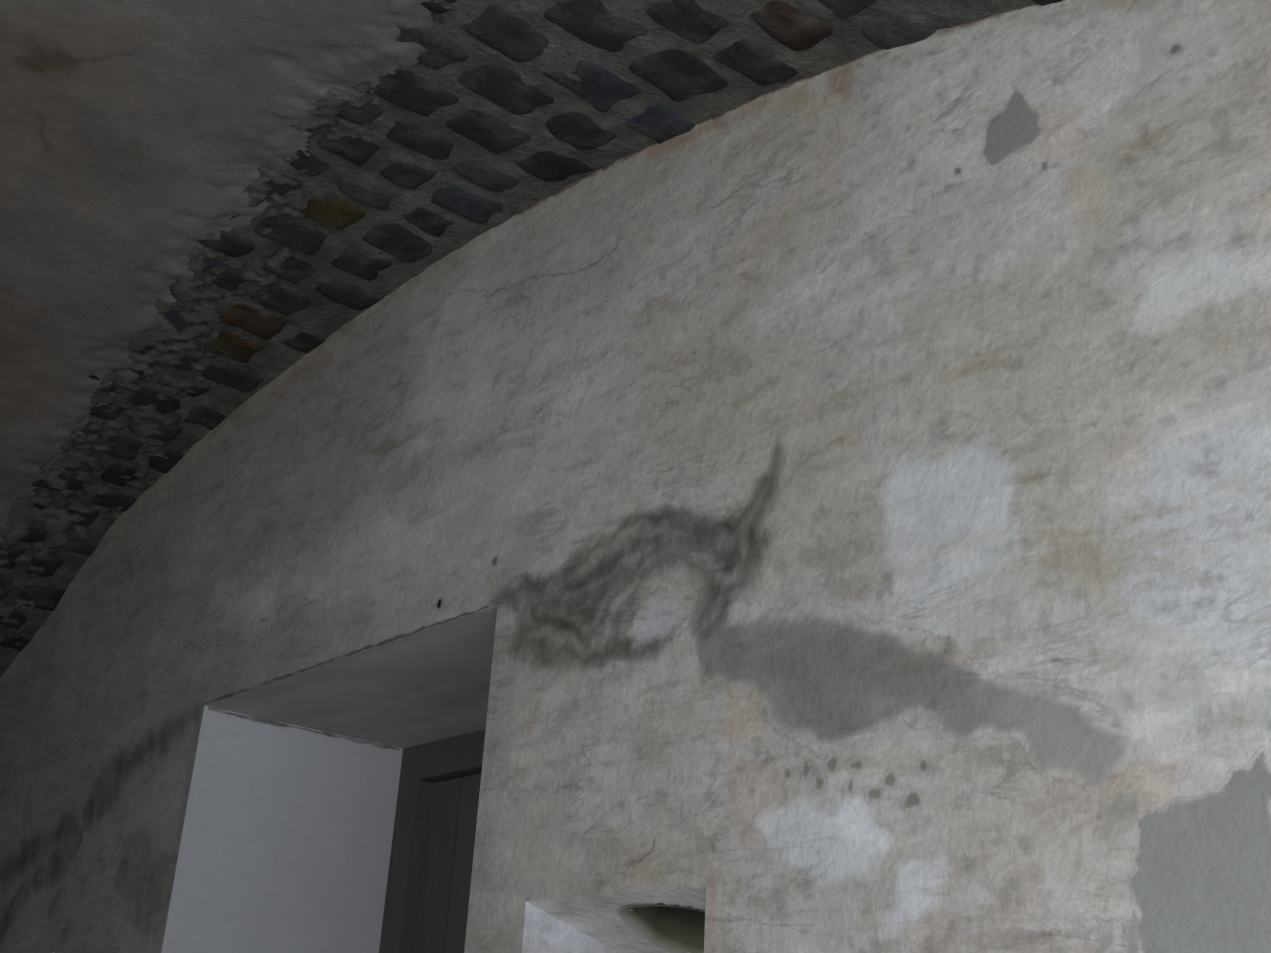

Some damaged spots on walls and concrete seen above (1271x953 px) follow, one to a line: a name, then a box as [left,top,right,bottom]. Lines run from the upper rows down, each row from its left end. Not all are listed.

spalling [1166,40,1185,58]
spalling [0,0,1065,678]
peeling [1122,225,1271,342]
water stain [483,421,987,760]
peeling [1091,747,1271,953]